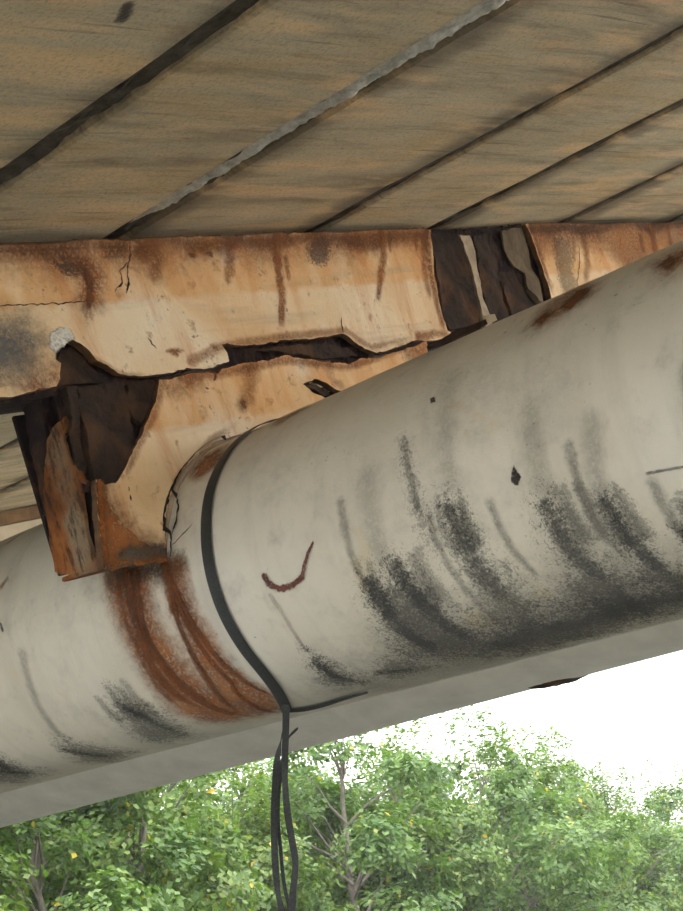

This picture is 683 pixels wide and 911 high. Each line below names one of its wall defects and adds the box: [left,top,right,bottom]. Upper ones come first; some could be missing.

spalling [212,336,373,372]
spalling [304,382,335,398]
spalling [5,327,160,495]
peeling [103,544,167,570]
peeling [262,541,314,592]